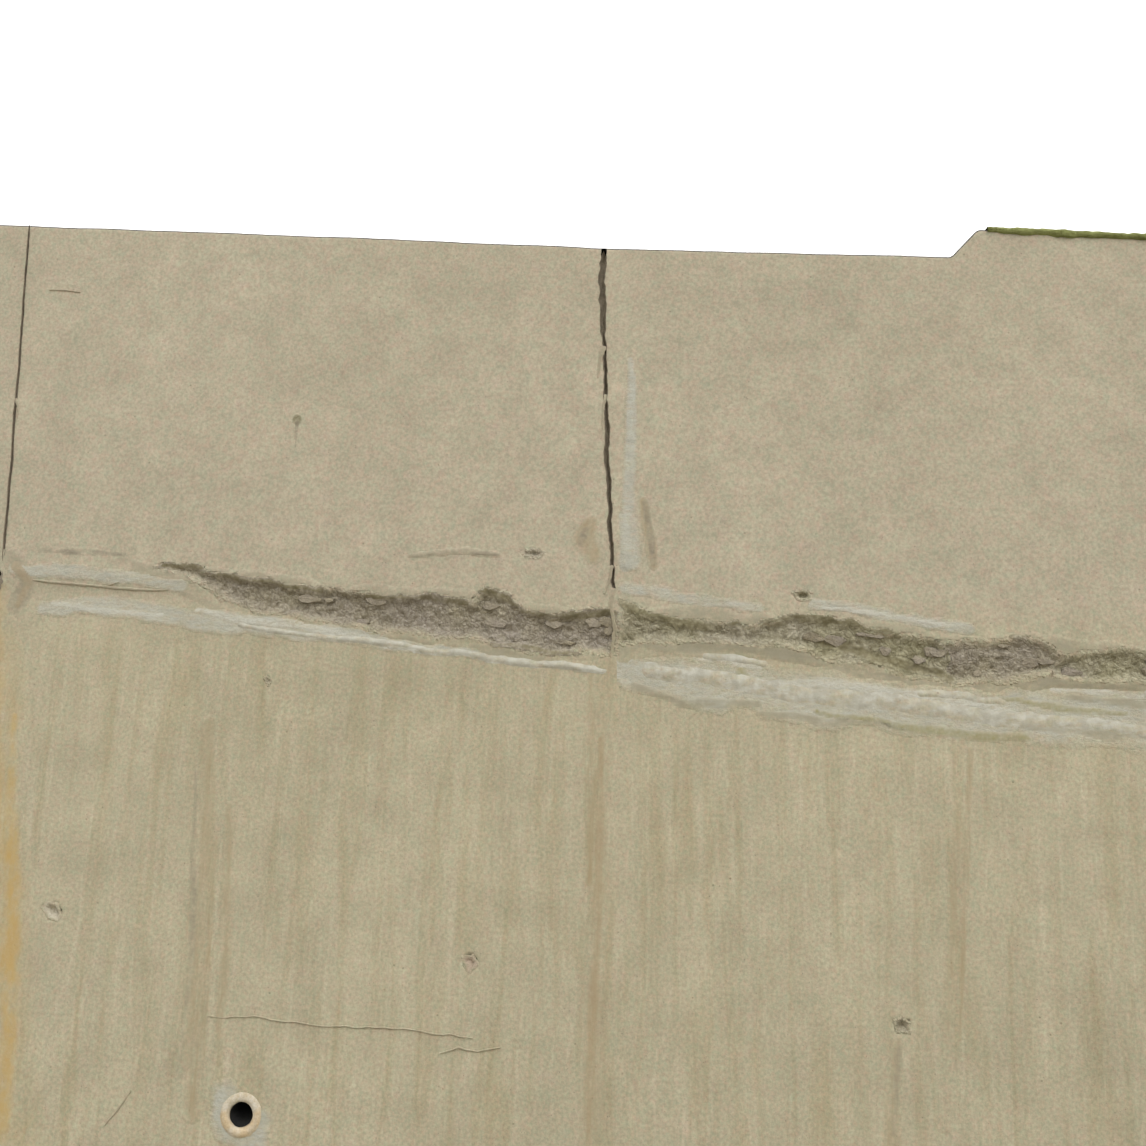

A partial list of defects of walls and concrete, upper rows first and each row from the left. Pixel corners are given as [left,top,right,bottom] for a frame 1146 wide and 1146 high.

crack [2,225,80,561]
crack [597,251,618,657]
spalling [153,561,1146,687]
leakage [2,546,1146,1146]